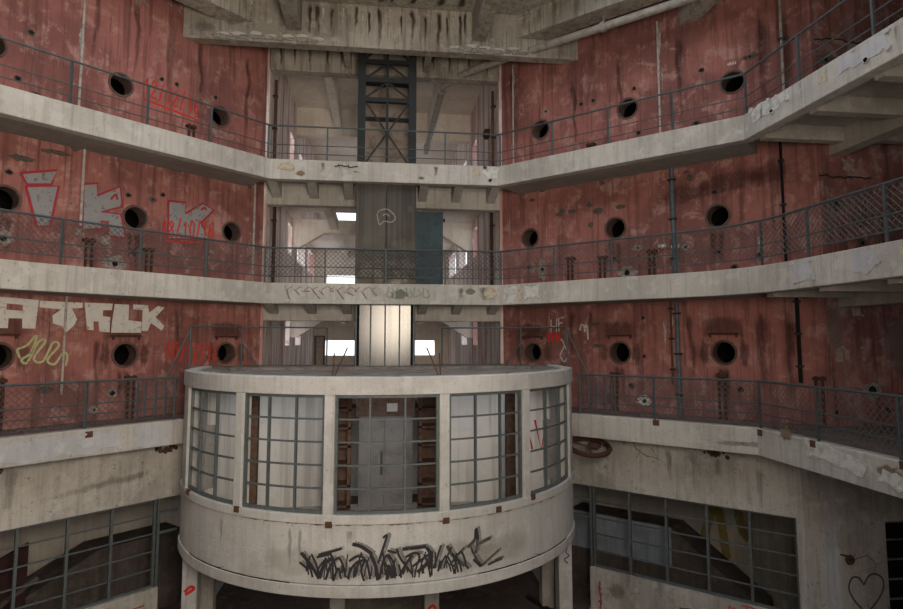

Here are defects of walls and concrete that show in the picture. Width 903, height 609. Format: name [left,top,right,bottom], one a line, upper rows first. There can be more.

water stain [215,6,344,61]
water stain [355,0,520,71]
peeling [804,437,868,478]
peeling [877,469,903,493]